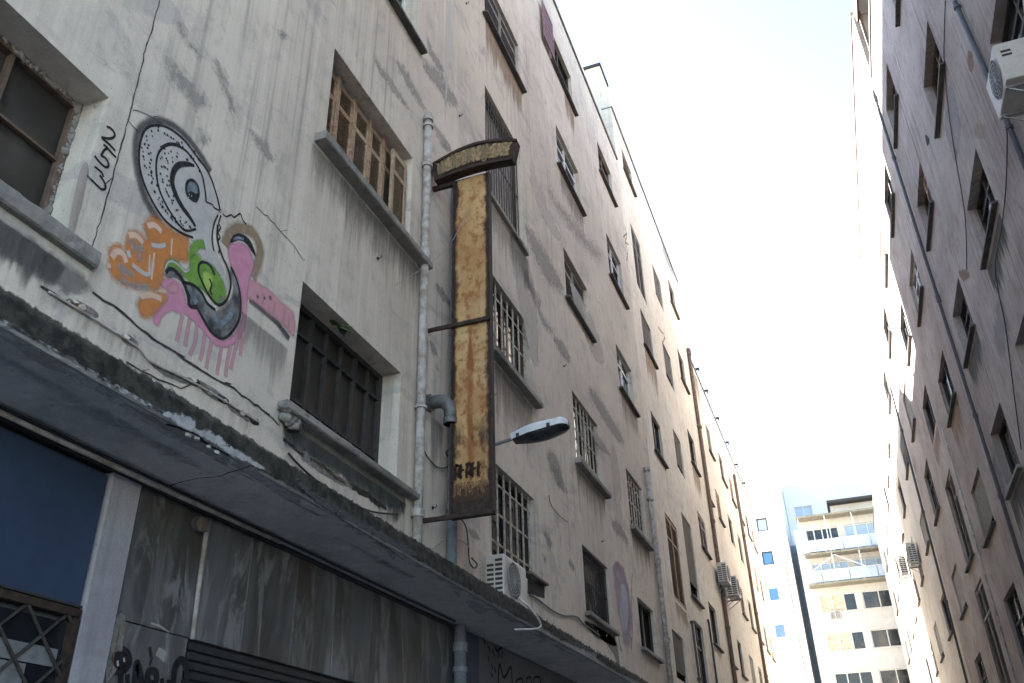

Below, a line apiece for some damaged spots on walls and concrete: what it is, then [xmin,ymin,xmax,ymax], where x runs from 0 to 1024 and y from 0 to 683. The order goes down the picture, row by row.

crack [256,206,304,261]
peeling [17,342,337,513]
leakage [163,412,265,470]
spalling [283,427,406,511]
leakage [284,424,405,519]